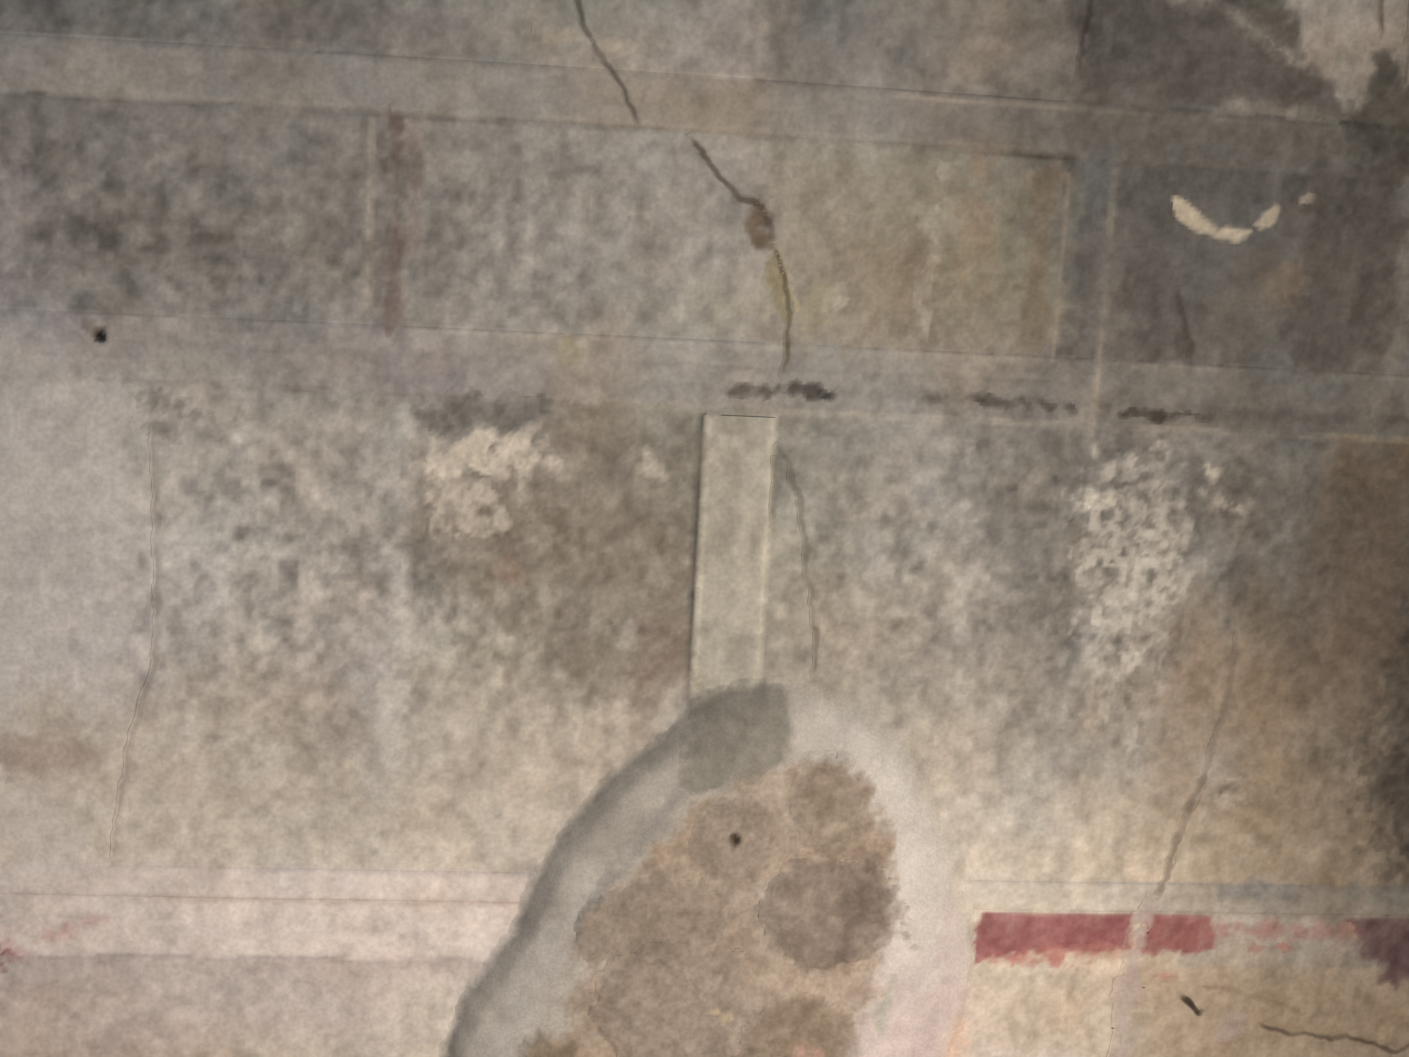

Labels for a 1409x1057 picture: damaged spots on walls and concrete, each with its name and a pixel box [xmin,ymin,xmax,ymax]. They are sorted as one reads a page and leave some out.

crack [573,0,641,128]
crack [1075,0,1095,76]
crack [1378,0,1409,46]
crack [686,132,794,378]
spalling [1170,189,1316,245]
water stain [705,0,1409,914]
water stain [339,382,787,832]
flaking render [515,751,912,1057]
crack [1106,634,1240,1057]
crack [1178,986,1409,1057]